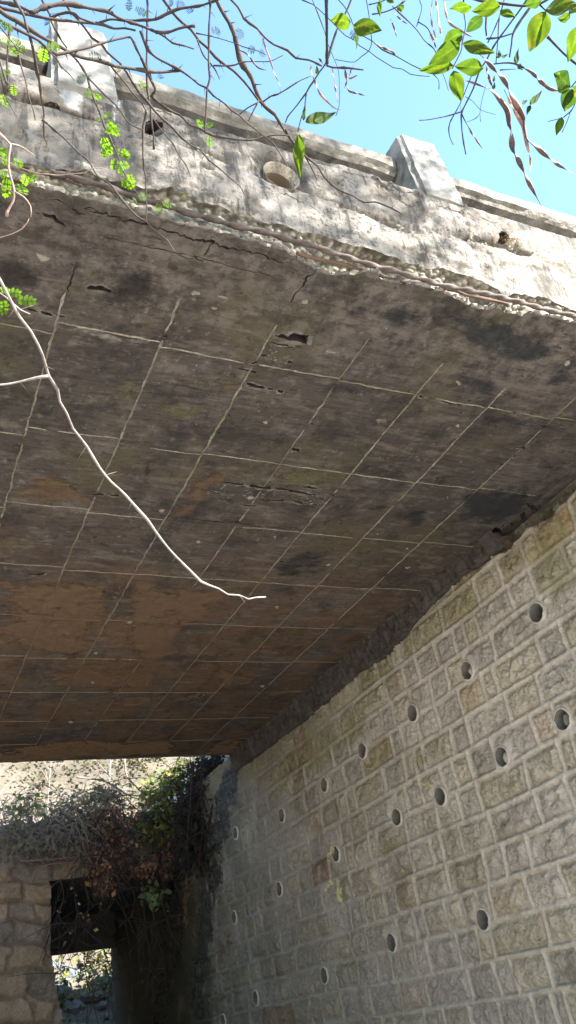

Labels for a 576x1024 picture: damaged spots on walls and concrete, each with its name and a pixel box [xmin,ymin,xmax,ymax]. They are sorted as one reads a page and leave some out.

crack [13,179,315,302]
spalling [0,161,576,335]
spalling [238,332,309,393]
water stain [387,310,416,324]
water stain [454,317,549,360]
water stain [462,488,526,524]